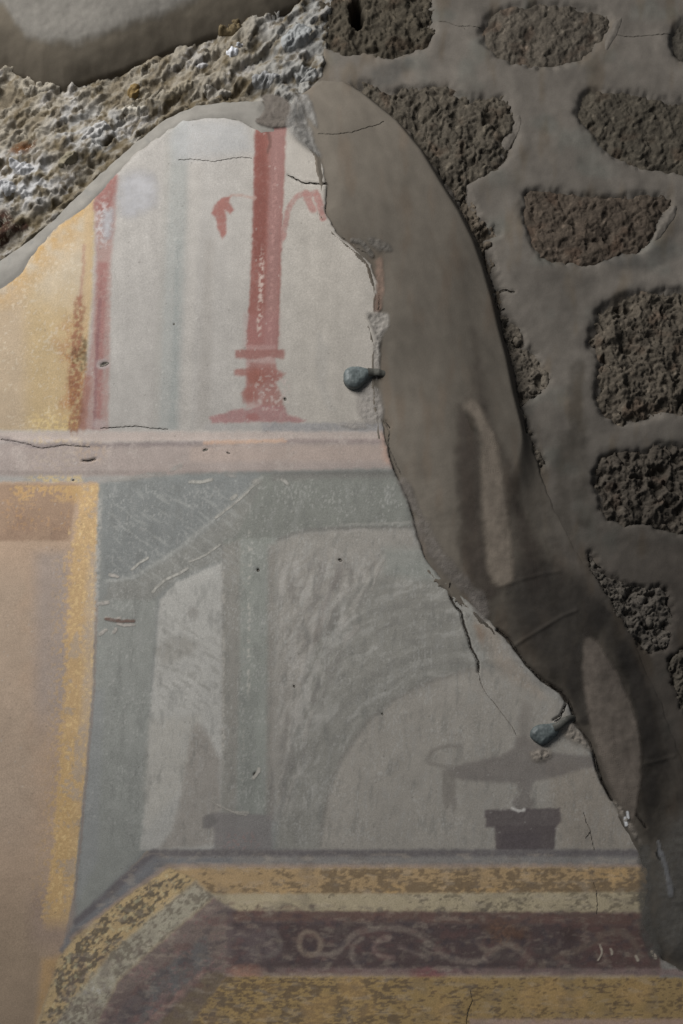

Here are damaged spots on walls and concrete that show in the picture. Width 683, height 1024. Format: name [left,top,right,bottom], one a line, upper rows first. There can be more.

spalling [0,0,333,261]
spalling [452,189,496,277]
flaking render [346,388,383,428]
flaking render [366,312,389,369]
spalling [495,291,549,467]
crack [448,583,515,732]
spalling [589,558,683,709]